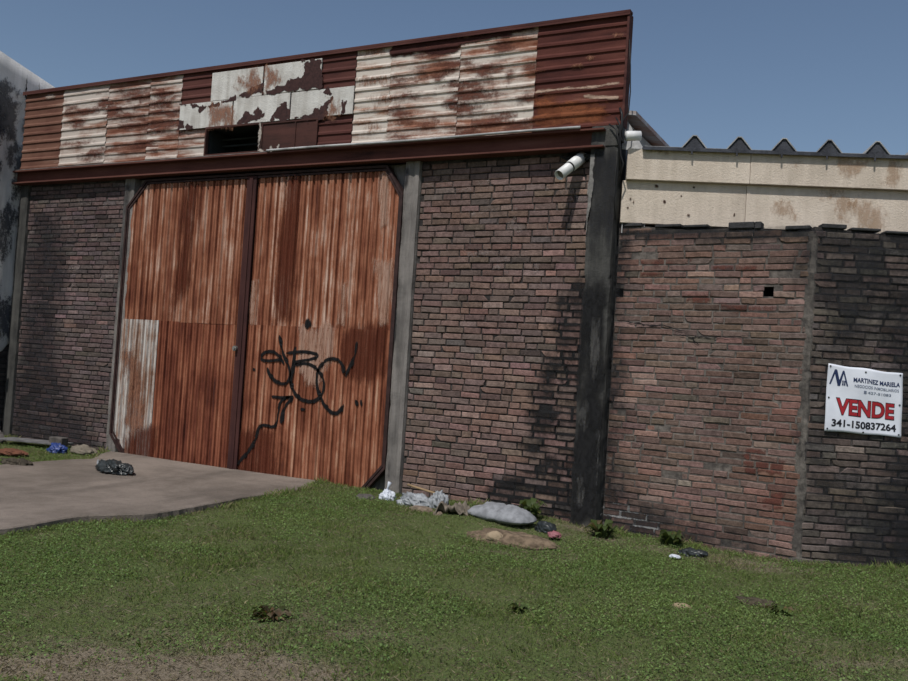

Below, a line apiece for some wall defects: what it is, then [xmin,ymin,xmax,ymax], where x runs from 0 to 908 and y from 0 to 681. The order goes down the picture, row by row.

rust [58,88,183,162]
peeling [179,58,347,152]
rust [169,181,202,316]
rust [274,176,302,320]
rust [378,175,389,227]
rust [122,351,157,457]
rust [250,280,259,324]
rust [237,427,278,475]
rust [299,258,393,387]
damp [485,148,908,567]